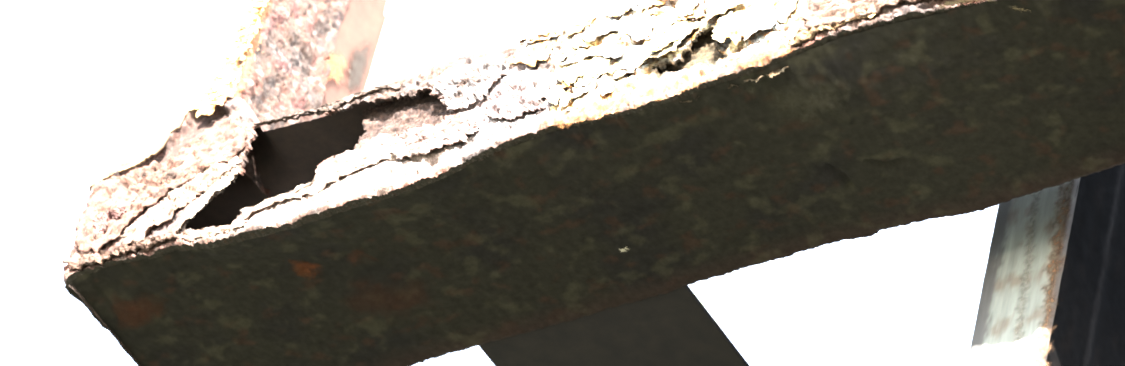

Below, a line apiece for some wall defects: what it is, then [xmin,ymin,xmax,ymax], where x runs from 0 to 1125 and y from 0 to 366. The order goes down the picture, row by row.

corrosion [62,0,269,271]
corrosion [325,54,346,82]
peeling [358,0,798,160]
corrosion [554,0,932,122]
corrosion [1035,183,1071,366]